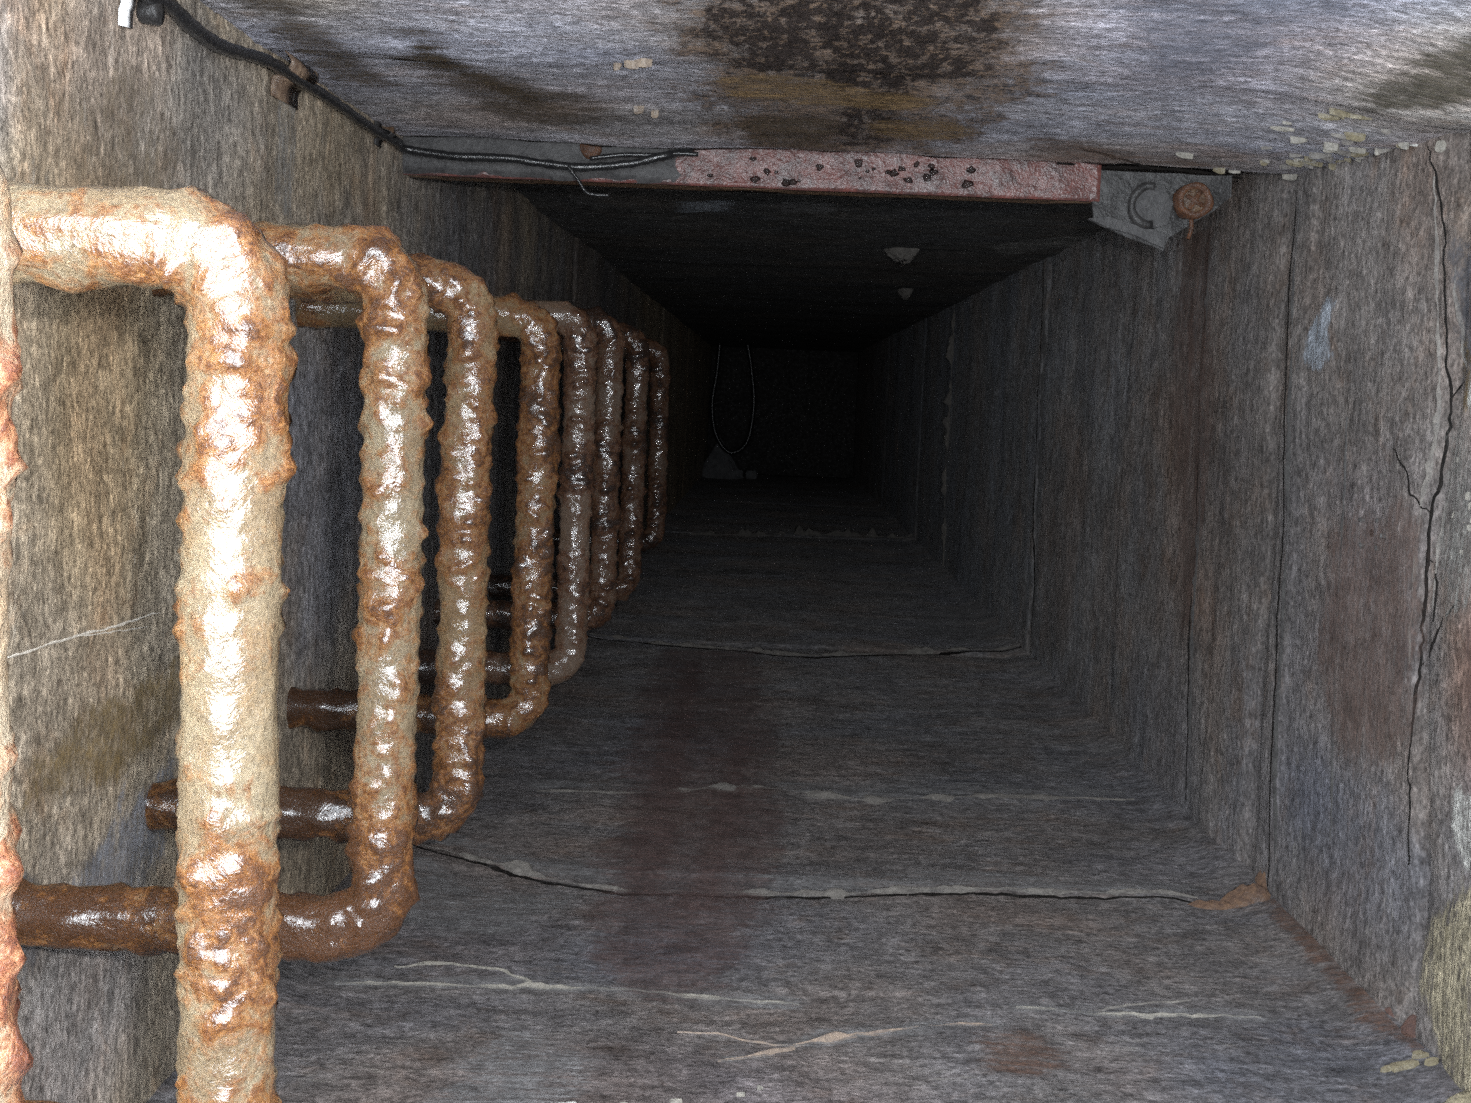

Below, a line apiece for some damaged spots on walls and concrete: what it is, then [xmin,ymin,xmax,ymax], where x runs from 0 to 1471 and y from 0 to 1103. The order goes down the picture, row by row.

crack [1391,145,1467,865]
water stain [1419,889,1471,1103]